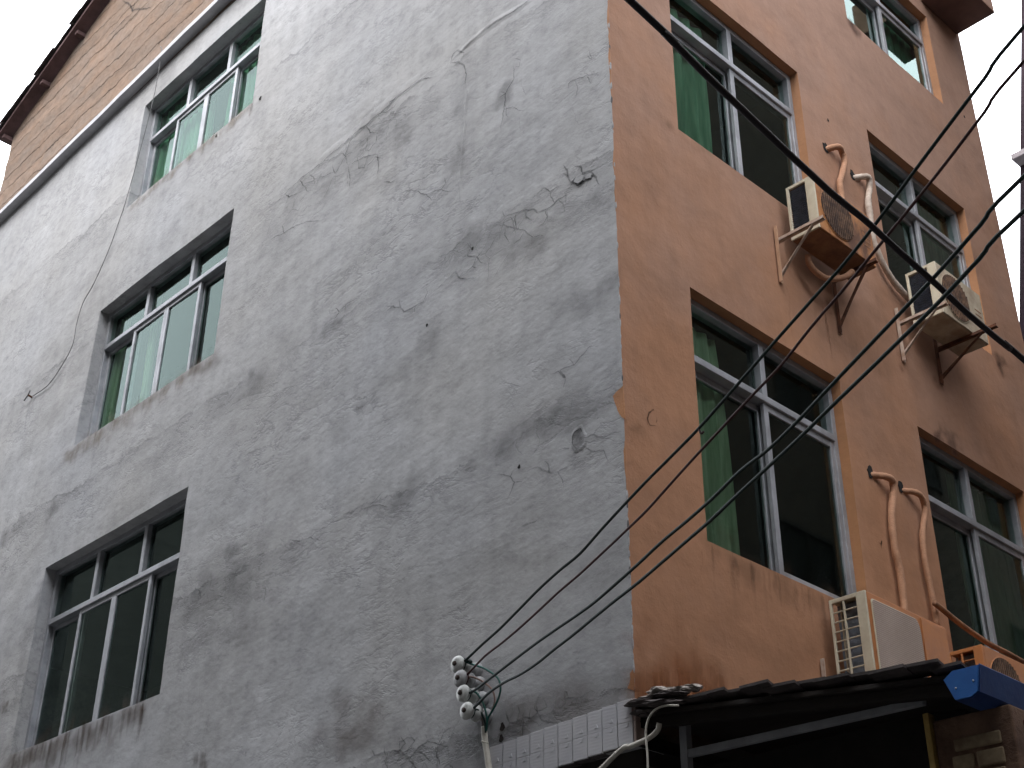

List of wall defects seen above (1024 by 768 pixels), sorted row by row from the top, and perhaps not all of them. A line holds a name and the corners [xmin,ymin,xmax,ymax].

crack [511,166,596,229]